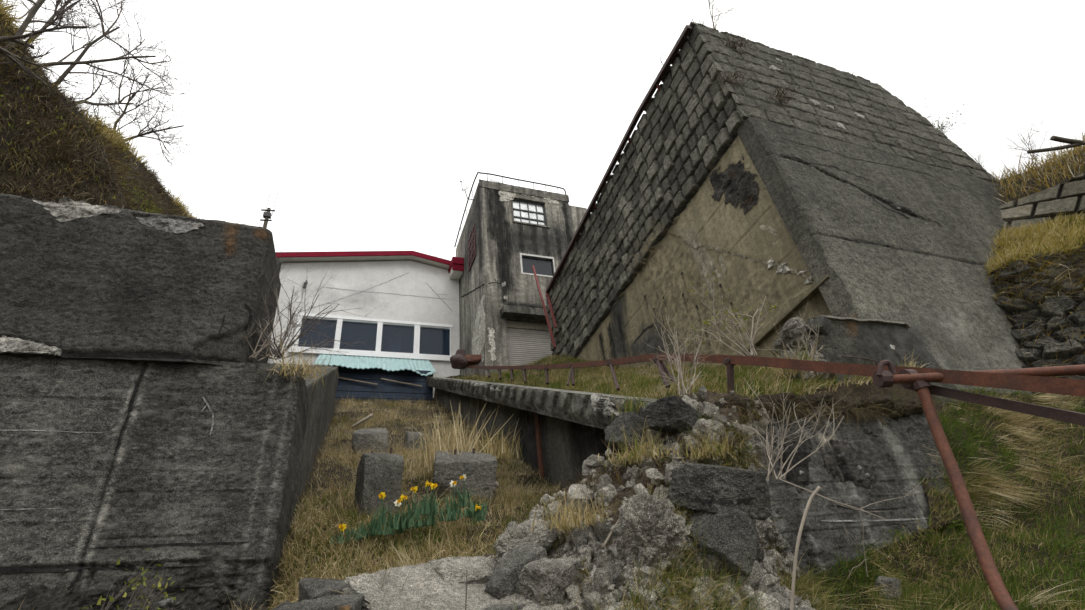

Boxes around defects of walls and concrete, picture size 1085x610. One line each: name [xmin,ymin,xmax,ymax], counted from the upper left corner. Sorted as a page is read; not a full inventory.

crack [767,137,976,227]
spalling [32,197,124,222]
spalling [135,216,204,234]
water stain [465,179,573,309]
crack [840,238,981,265]
spalling [0,335,62,355]